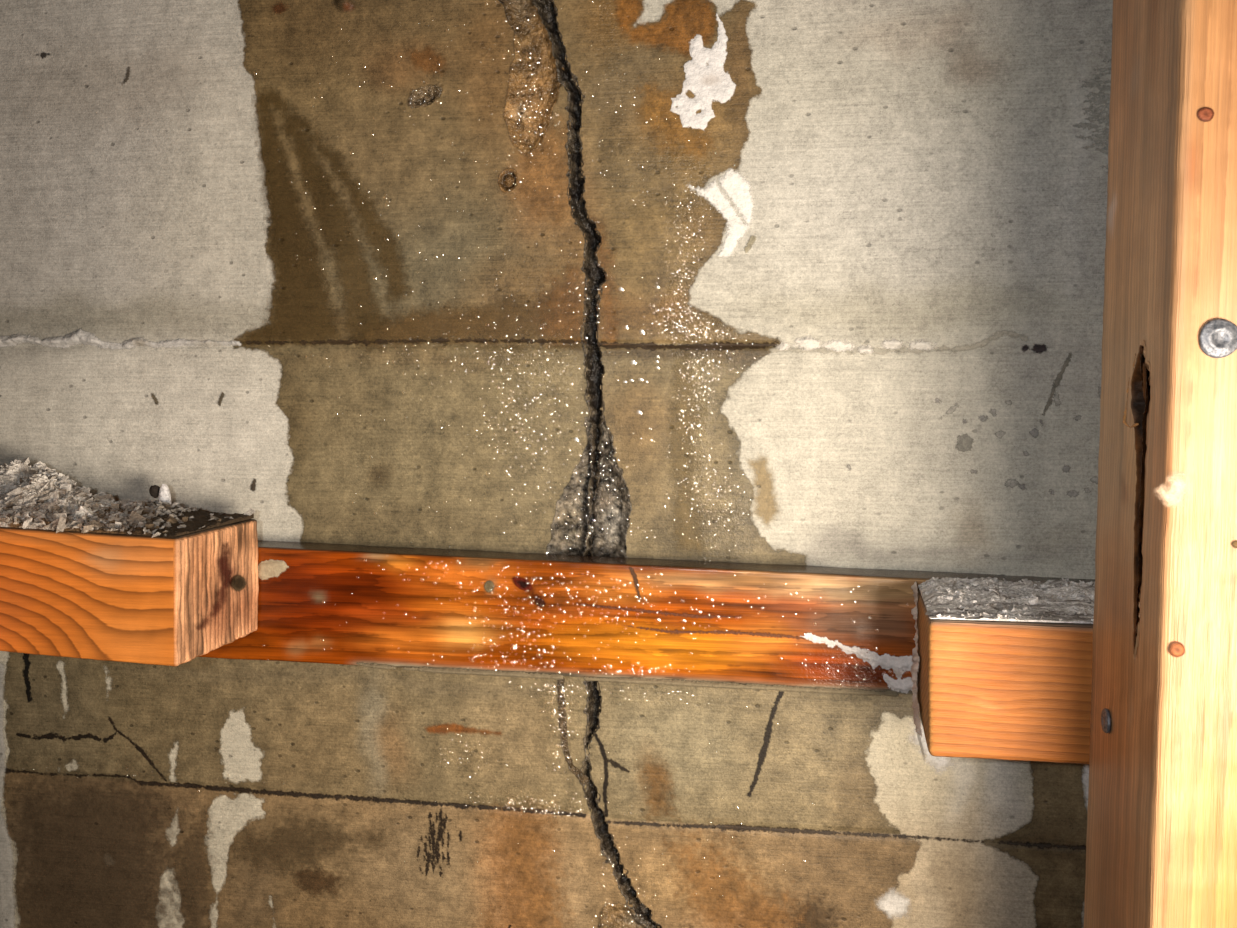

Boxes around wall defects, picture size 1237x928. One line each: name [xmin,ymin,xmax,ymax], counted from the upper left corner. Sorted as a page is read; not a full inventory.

rust [618,0,715,54]
rust [644,87,709,155]
leakage [0,0,1027,566]
crack [533,0,607,556]
crack [23,653,32,702]
crack [16,716,167,781]
leakage [0,577,1095,928]
crack [557,677,662,928]
crack [748,691,784,797]